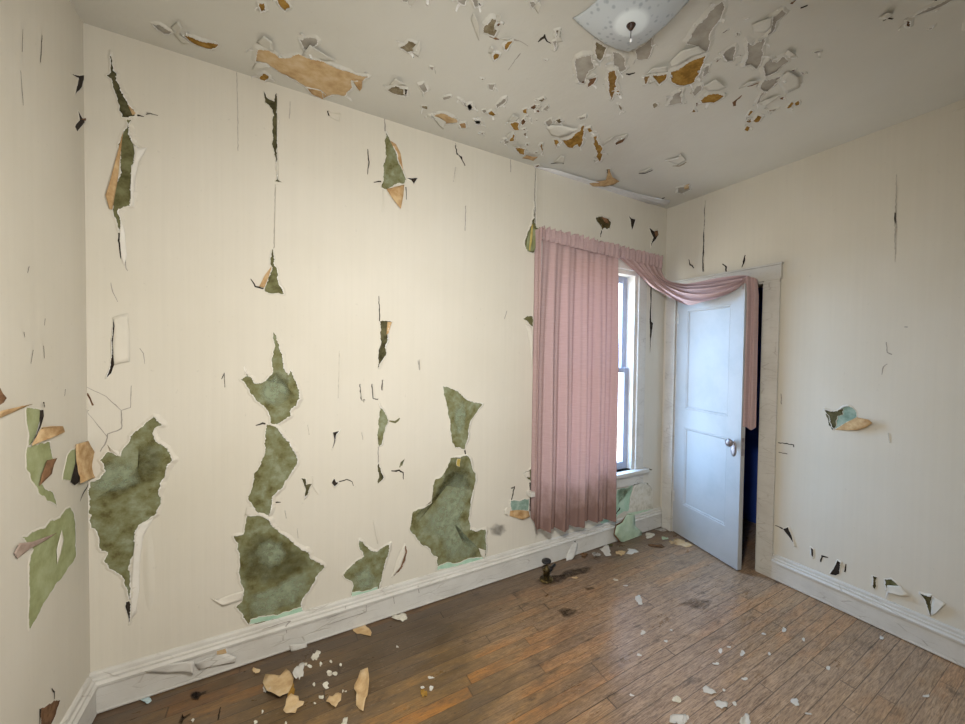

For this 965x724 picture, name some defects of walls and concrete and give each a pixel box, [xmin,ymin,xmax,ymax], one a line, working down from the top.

peeling [245,33,372,102]
peeling [396,38,421,58]
peeling [571,0,808,115]
peeling [743,109,766,132]